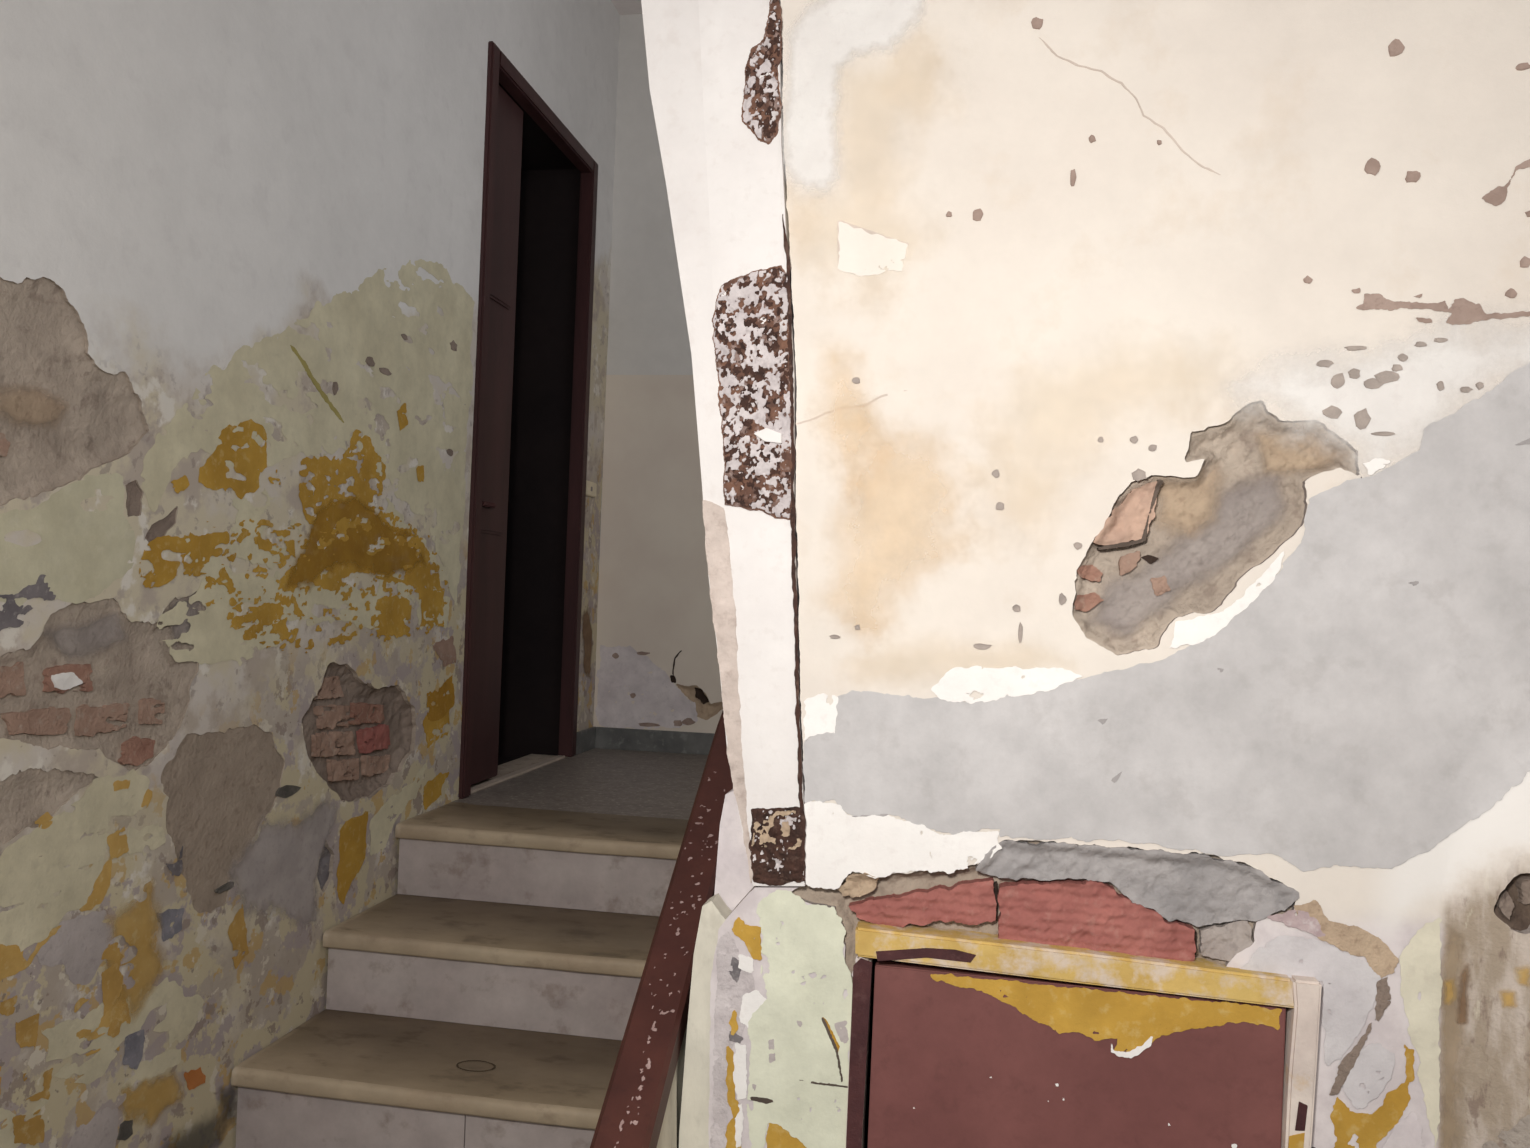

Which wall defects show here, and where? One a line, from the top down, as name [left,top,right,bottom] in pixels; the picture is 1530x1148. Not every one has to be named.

rust [741,0,782,145]
crack [1040,38,1220,175]
rust [712,265,792,520]
flaking render [1059,324,1530,655]
peeling [0,259,475,1148]
flaking render [595,500,753,883]
peeling [803,693,838,741]
peeling [931,643,1082,704]
flaking render [1012,604,1023,643]
rust [749,806,806,886]
flaking render [710,801,1299,1148]
peeling [1330,918,1453,1148]